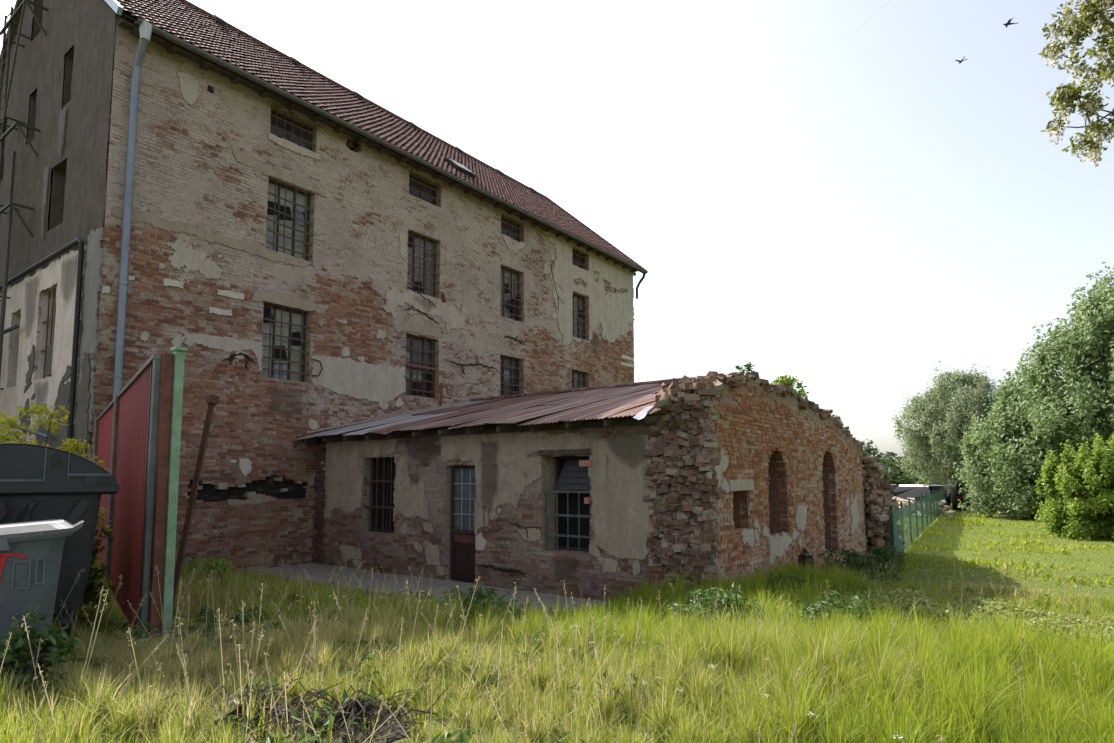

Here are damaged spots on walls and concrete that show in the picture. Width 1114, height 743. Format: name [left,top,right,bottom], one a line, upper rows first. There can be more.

flaking render [102,206,231,292]
crack [223,352,255,369]
flaking render [521,328,634,393]
flaking render [706,447,730,494]
flaking render [589,543,642,577]